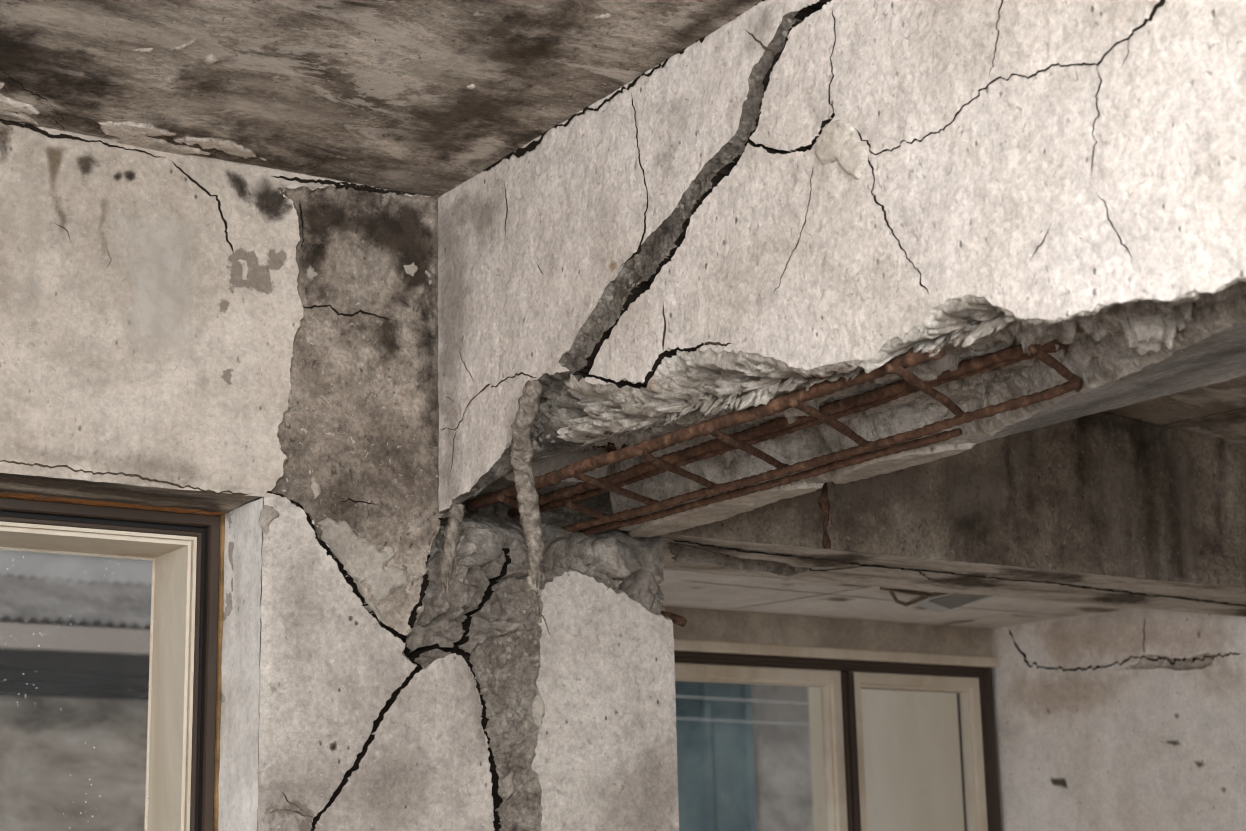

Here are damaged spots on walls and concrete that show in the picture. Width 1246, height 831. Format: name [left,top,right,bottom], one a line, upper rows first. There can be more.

leakage [0,29,112,134]
peeling [131,35,199,53]
leakage [78,157,96,173]
crack [0,74,234,253]
leakage [146,97,436,382]
crack [272,176,416,249]
crack [438,0,1165,520]
corrosion [584,431,628,453]
spalling [220,185,1246,831]
leakage [780,466,915,510]
crack [0,460,511,831]
crack [673,540,1246,672]